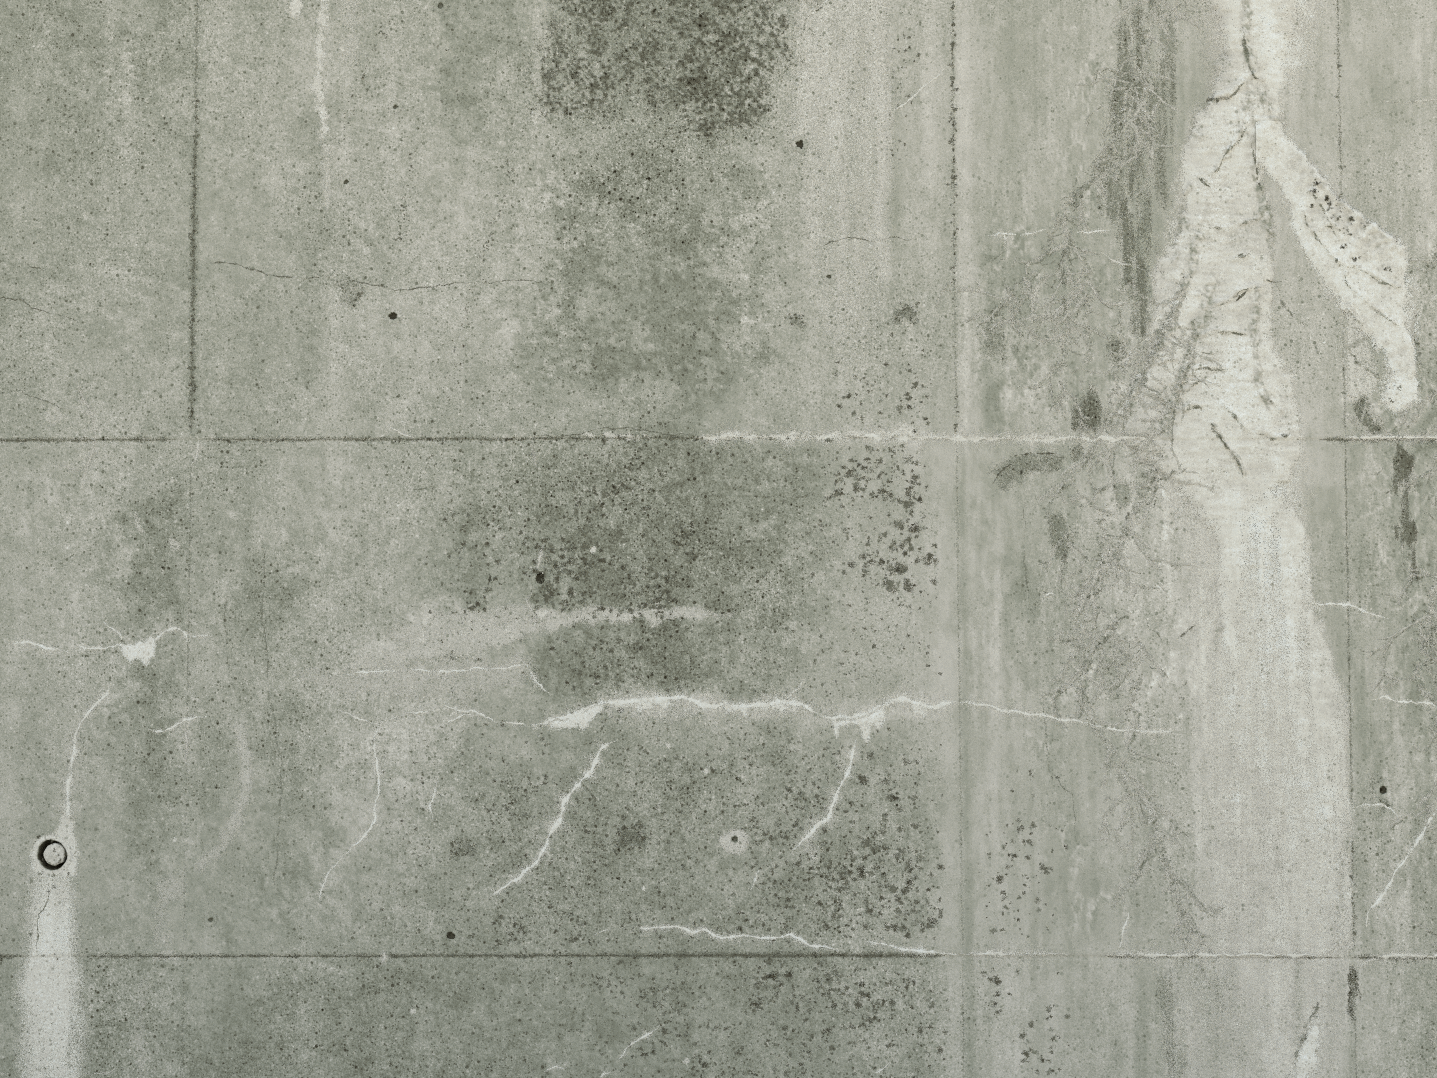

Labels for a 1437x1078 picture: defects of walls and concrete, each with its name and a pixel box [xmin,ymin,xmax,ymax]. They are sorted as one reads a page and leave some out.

leakage [288,0,363,211]
crack [6,538,282,889]
crack [317,549,1176,899]
leakage [1070,0,1423,1078]
crack [1308,600,1389,620]
crack [1373,692,1436,711]
leakage [10,805,91,1078]
crack [595,922,1068,967]
crack [1104,803,1437,972]